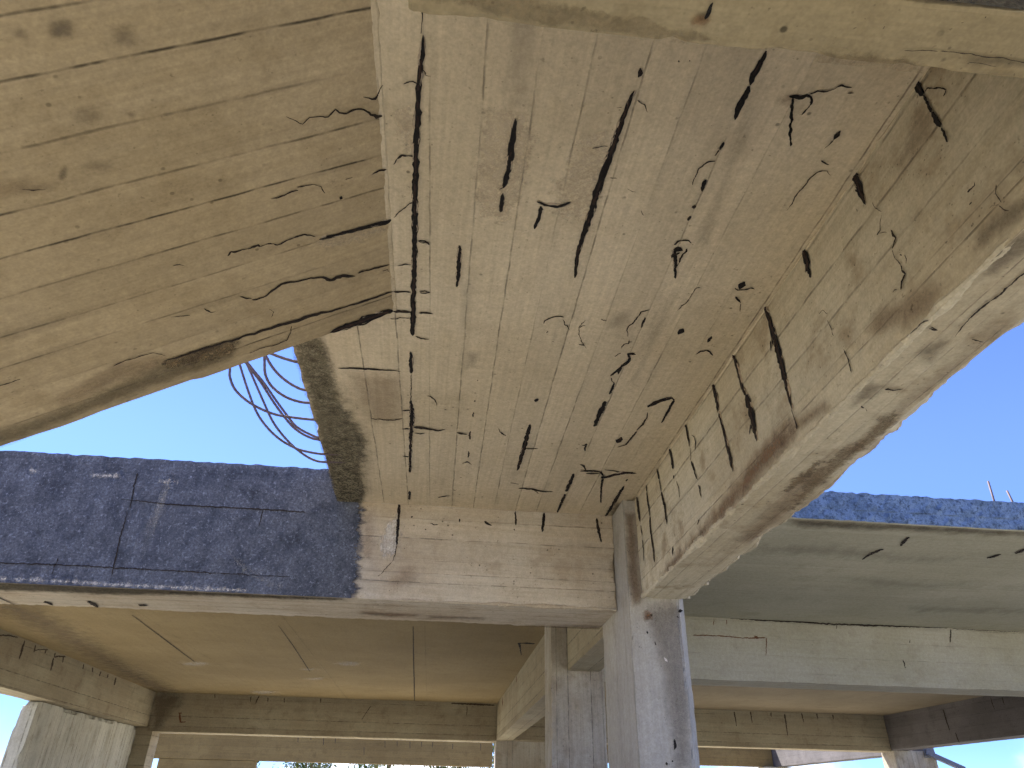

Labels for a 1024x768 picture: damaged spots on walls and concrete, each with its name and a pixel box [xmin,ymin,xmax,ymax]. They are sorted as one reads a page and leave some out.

crack [286,85,383,125]
crack [271,169,386,199]
crack [228,234,315,256]
crack [636,425,701,562]
water stain [691,414,812,544]
water stain [799,520,1007,534]